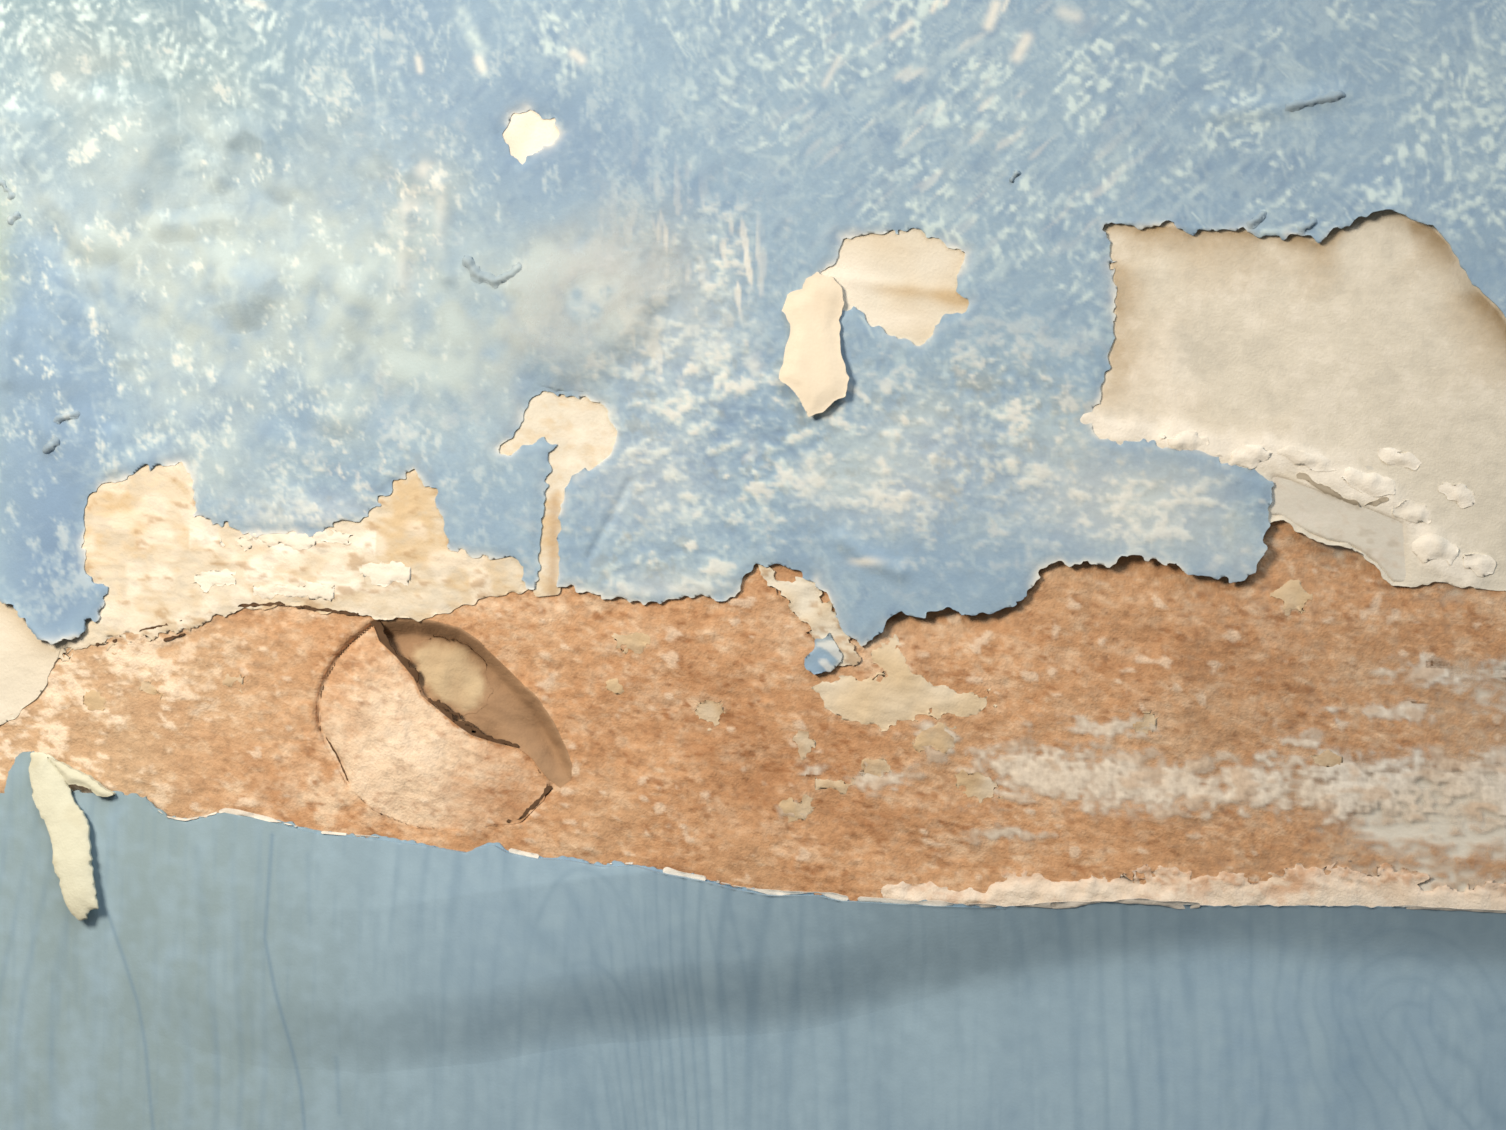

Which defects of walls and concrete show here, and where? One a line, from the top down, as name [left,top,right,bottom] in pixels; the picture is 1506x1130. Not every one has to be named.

peeling [502,110,559,164]
spalling [0,210,1506,901]
crack [96,620,185,647]
crack [238,601,519,782]
crack [507,786,552,823]